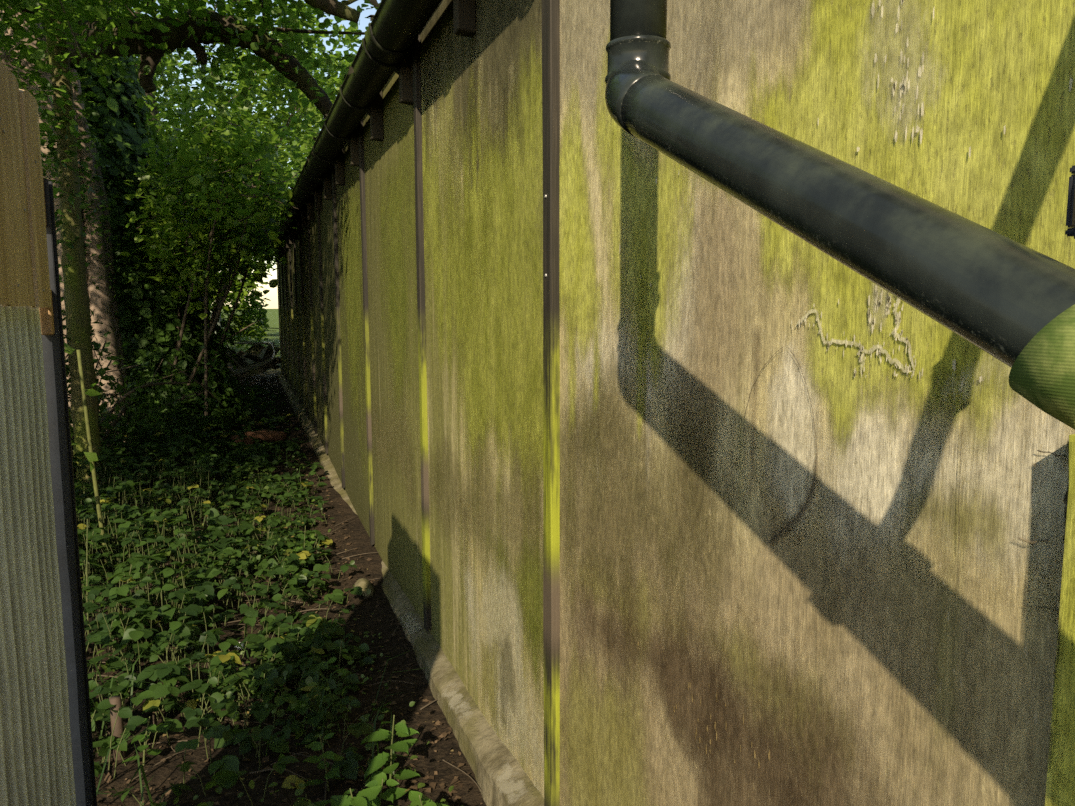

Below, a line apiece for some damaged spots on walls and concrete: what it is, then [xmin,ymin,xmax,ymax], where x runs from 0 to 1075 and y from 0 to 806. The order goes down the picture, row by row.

leakage [420,0,542,136]
leakage [560,0,610,107]
leakage [667,0,803,80]
crack [744,345,818,544]
leakage [560,194,1068,806]